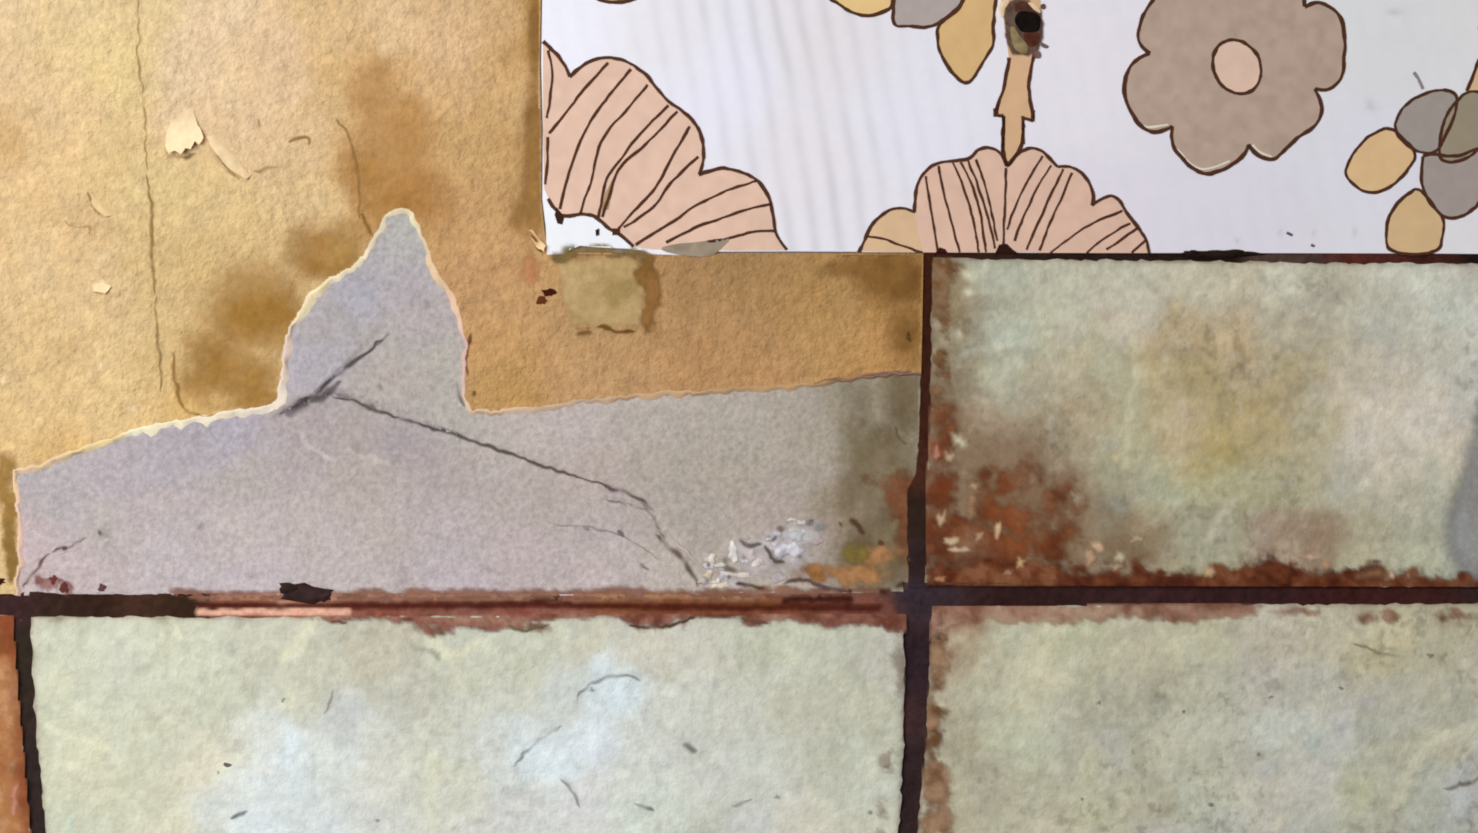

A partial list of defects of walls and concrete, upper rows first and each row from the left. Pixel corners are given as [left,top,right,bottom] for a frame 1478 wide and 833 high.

crack [136,0,212,417]
peeling [165,108,260,179]
water stain [187,274,297,408]
water stain [299,231,357,276]
water stain [365,119,423,210]
peeling [13,208,921,596]
crack [288,335,698,583]
corrosion [931,259,956,332]
corrosion [171,589,283,601]
corrosion [323,350,1478,833]
corrosion [0,615,32,833]